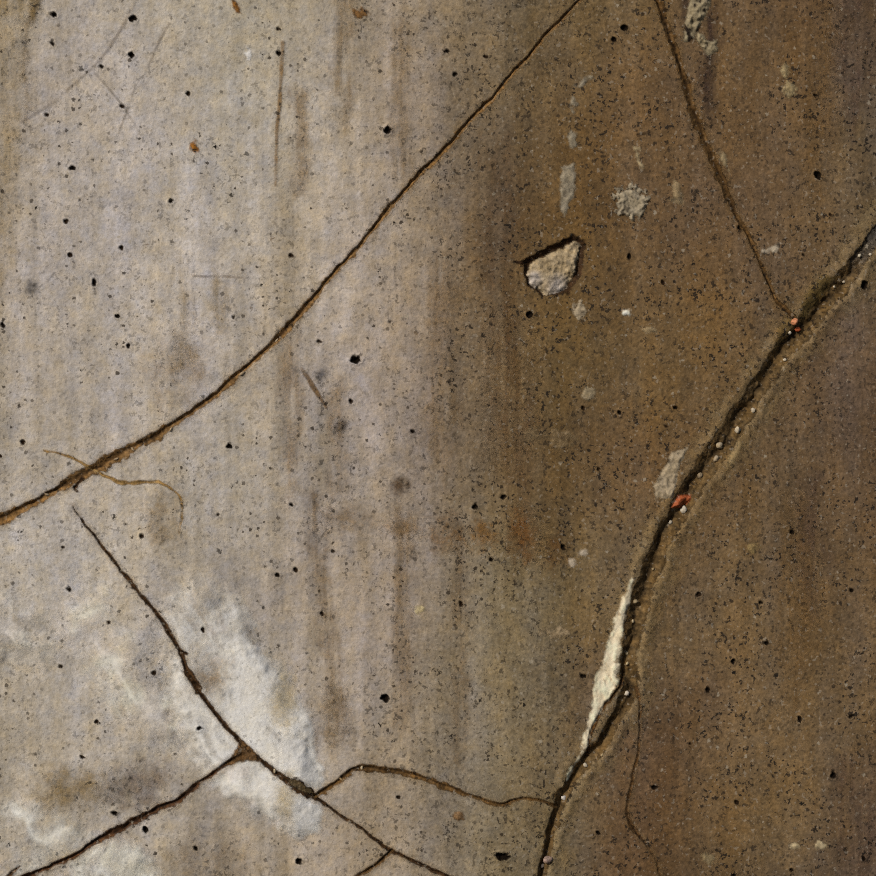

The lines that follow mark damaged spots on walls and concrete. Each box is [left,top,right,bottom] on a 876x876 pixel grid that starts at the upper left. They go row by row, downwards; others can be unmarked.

crack [21,519,557,876]
crack [0,0,582,525]
spalling [513,234,587,320]
crack [528,0,876,876]